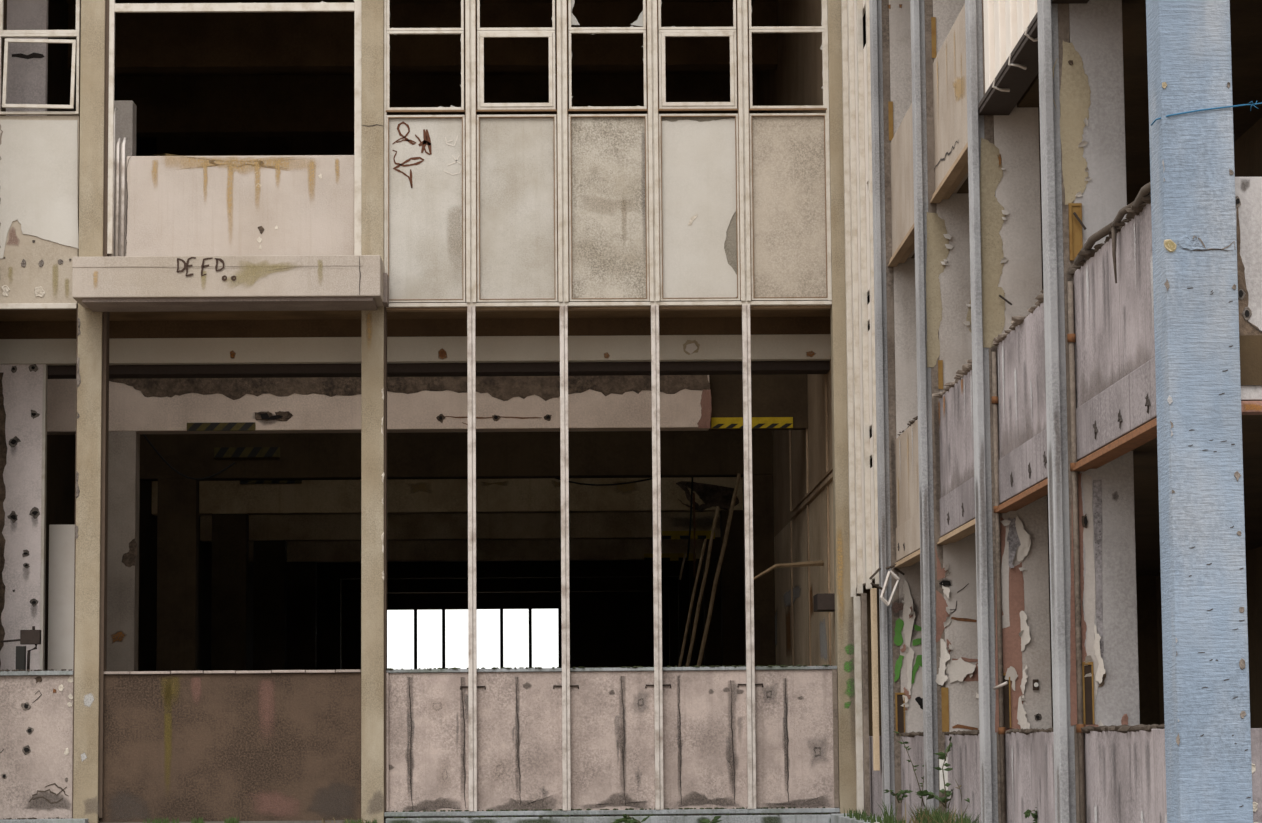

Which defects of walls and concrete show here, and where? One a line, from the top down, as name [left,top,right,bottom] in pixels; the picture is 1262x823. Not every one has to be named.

peeling [1060,41,1091,205]
peeling [926,212,954,367]
peeling [963,138,1009,348]
flaking render [109,377,361,423]
flaking render [381,375,712,429]
peeling [935,547,979,698]
peeling [995,516,1031,733]
peeling [1070,473,1106,727]
water stain [409,677,466,812]
water stain [589,676,645,808]
water stain [678,680,735,806]
water stain [770,678,826,808]